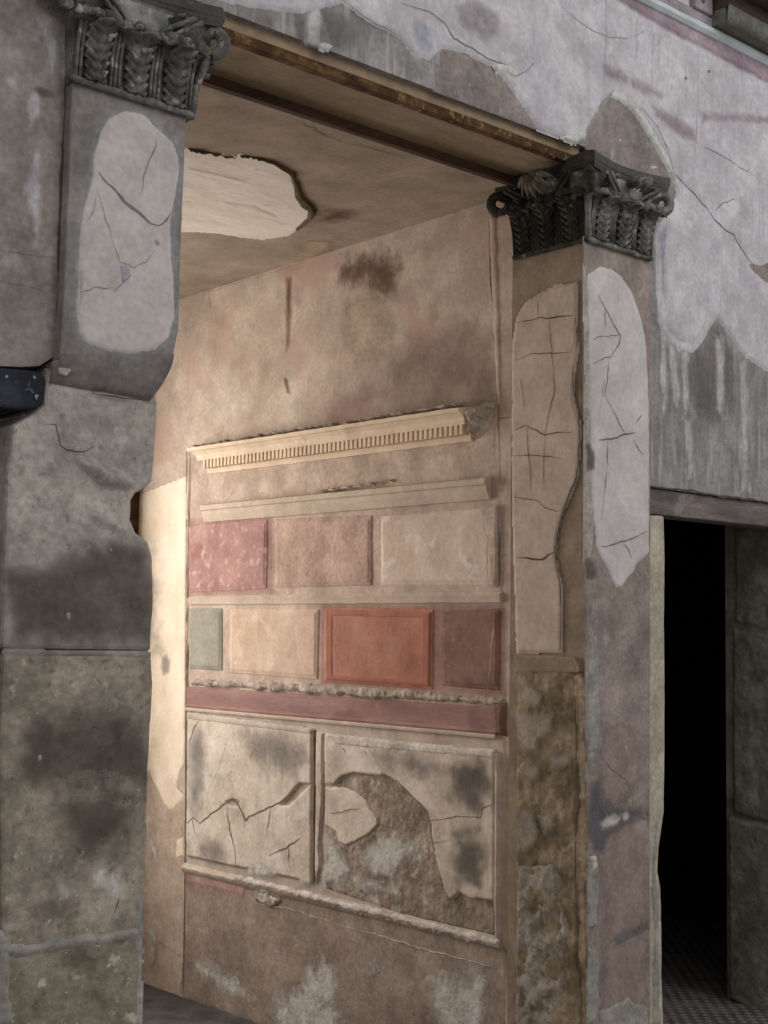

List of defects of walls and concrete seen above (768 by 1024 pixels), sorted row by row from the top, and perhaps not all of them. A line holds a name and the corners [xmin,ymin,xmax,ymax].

crack [80,138,172,304]
peeling [181,148,317,240]
crack [403,3,526,76]
flaking render [433,49,536,130]
flaking render [560,91,678,205]
crack [482,302,648,642]
leakage [660,328,751,494]
leakage [26,715,146,845]
crack [187,745,493,877]
spalling [190,627,661,1024]
leakage [456,841,480,885]
leakage [452,765,488,809]